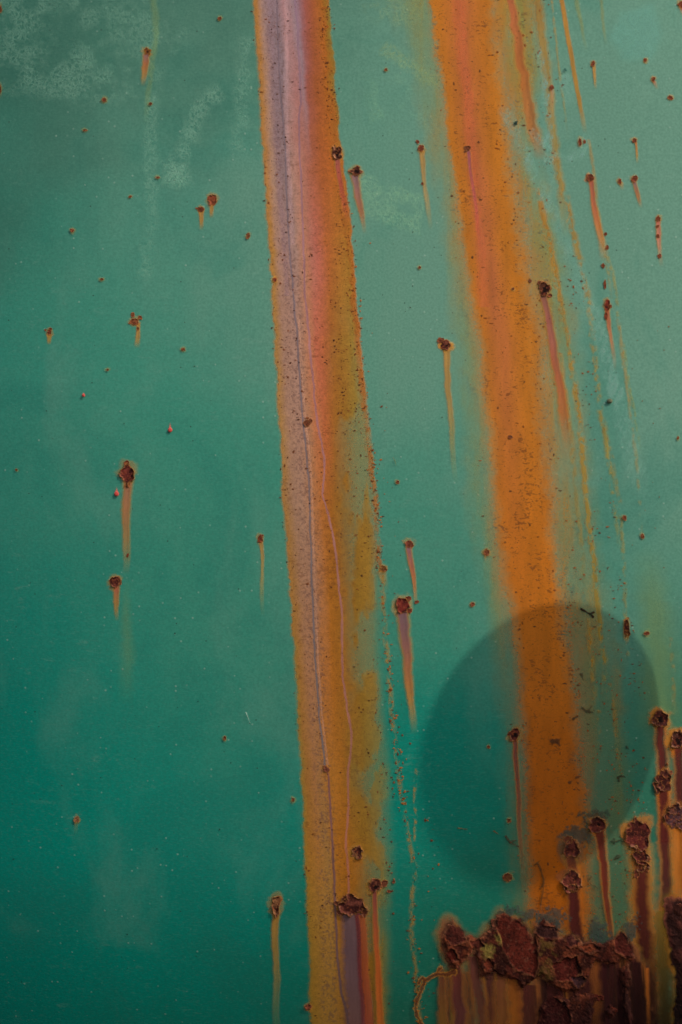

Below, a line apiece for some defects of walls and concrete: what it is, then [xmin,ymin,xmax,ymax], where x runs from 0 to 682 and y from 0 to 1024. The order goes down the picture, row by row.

rust [128,312,142,343]
rust [118,460,136,557]
rust [250,0,682,1024]
rust [108,575,122,614]